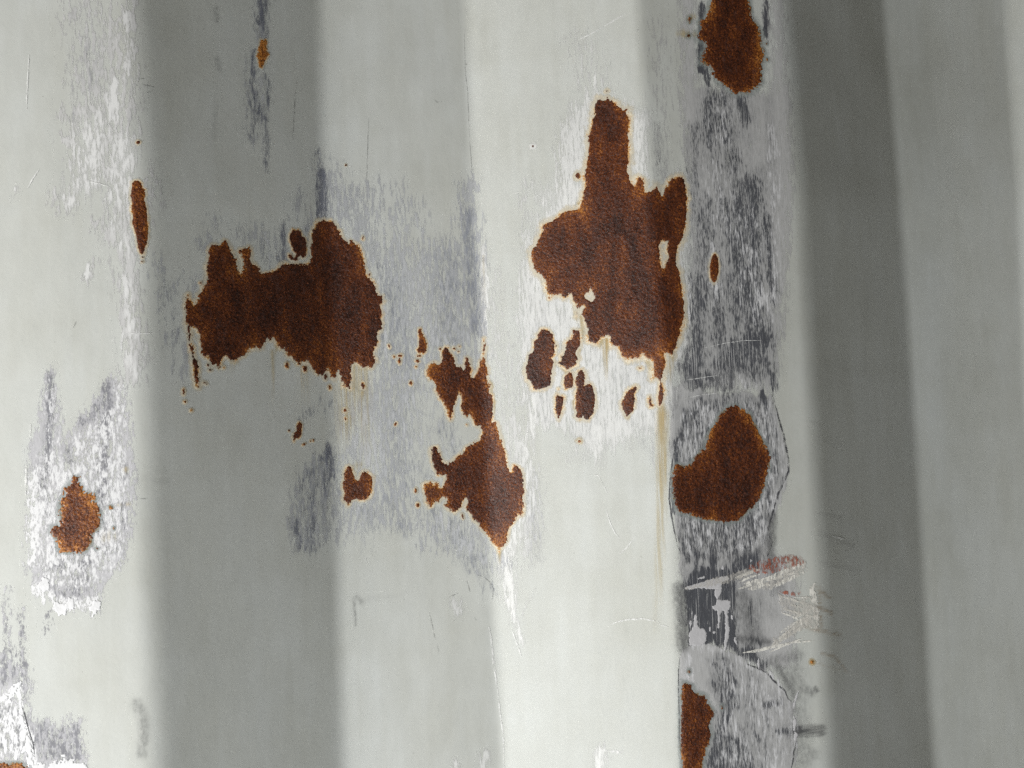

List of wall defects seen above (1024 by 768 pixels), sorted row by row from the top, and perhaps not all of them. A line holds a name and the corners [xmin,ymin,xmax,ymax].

rust [682,0,768,96]
peeling [21,0,203,636]
rust [129,179,150,264]
rust [522,88,692,437]
rust [180,217,526,557]
peeling [236,0,802,768]
rust [50,475,116,555]
rust [659,403,771,524]
rust [678,668,723,768]